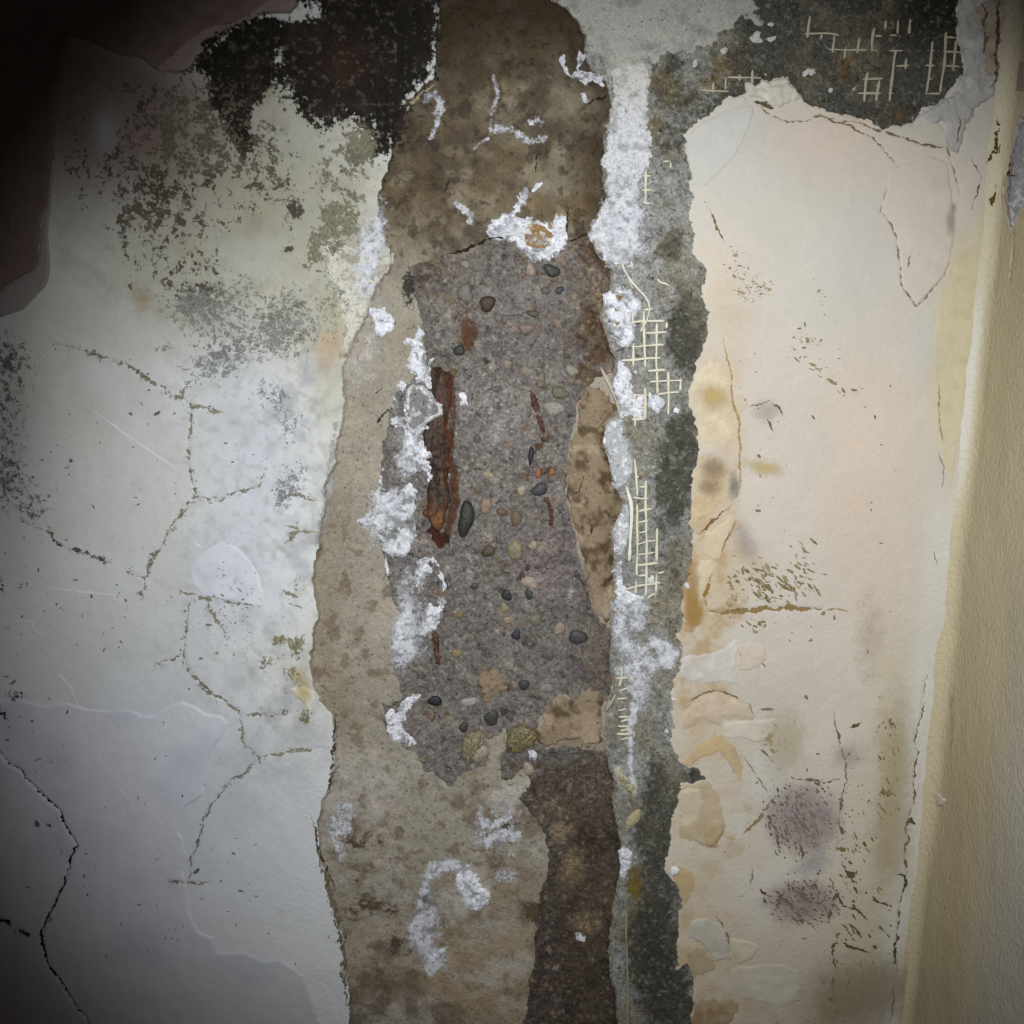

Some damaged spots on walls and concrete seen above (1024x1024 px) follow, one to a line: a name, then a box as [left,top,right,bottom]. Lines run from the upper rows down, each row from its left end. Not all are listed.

water stain [58,0,446,397]
crack [760,106,982,307]
crack [48,343,316,598]
crack [154,589,337,891]
efflorescence [357,326,447,668]
efflorescence [385,694,422,746]
corrosion [428,374,460,548]
efflorescence [390,856,517,976]
flaking render [290,0,985,1024]
efflorescence [607,598,681,785]
crack [702,575,849,615]
crack [794,675,928,1021]